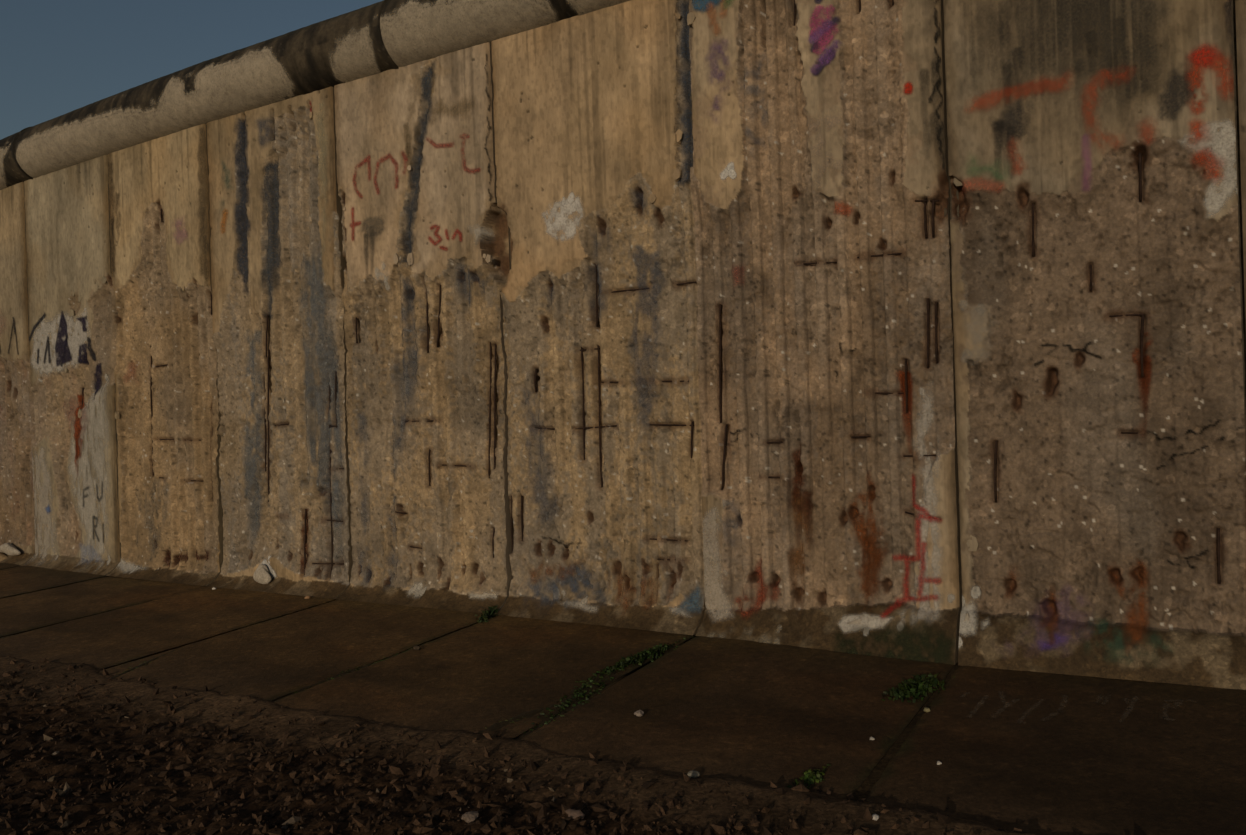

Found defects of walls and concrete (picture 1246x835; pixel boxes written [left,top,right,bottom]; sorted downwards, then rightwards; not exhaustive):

spalling [0,0,1246,648]
rust [791,450,812,527]
rust [854,478,883,596]